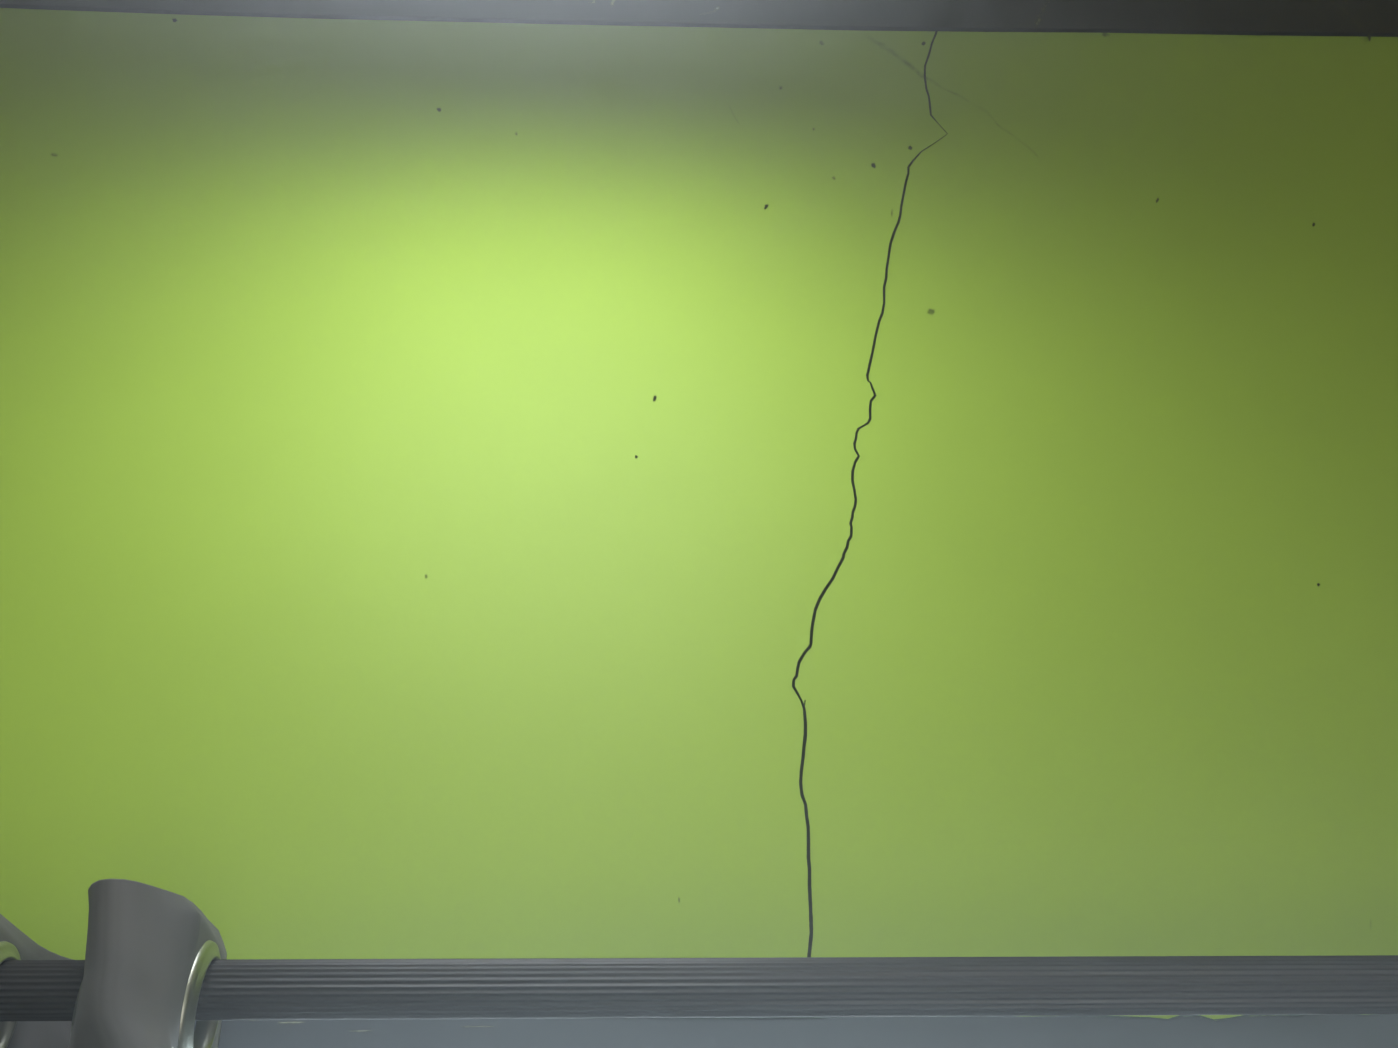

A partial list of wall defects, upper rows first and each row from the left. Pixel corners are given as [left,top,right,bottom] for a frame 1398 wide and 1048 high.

crack [792,31,948,957]